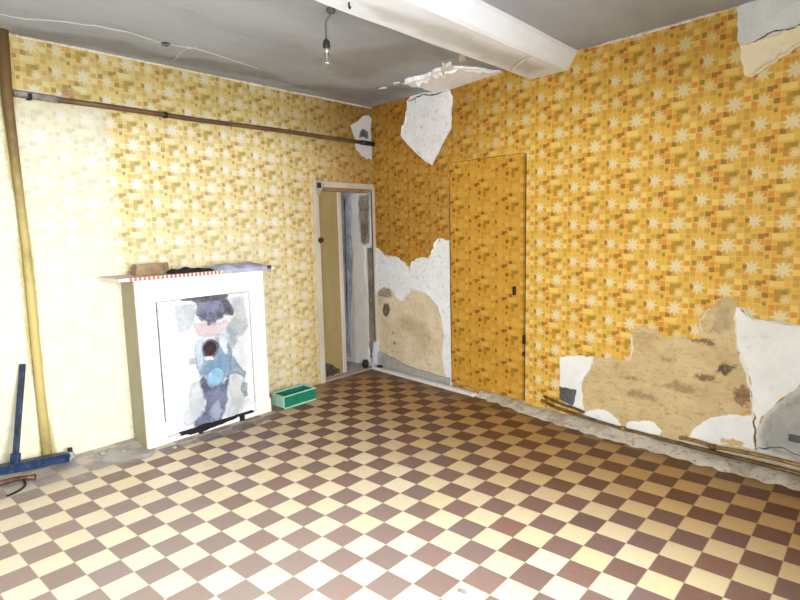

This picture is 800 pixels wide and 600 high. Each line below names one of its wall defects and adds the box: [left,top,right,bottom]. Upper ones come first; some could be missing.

flaking render [350,115,372,160]
flaking render [379,54,530,92]
flaking render [341,195,446,377]
flaking render [581,297,800,472]